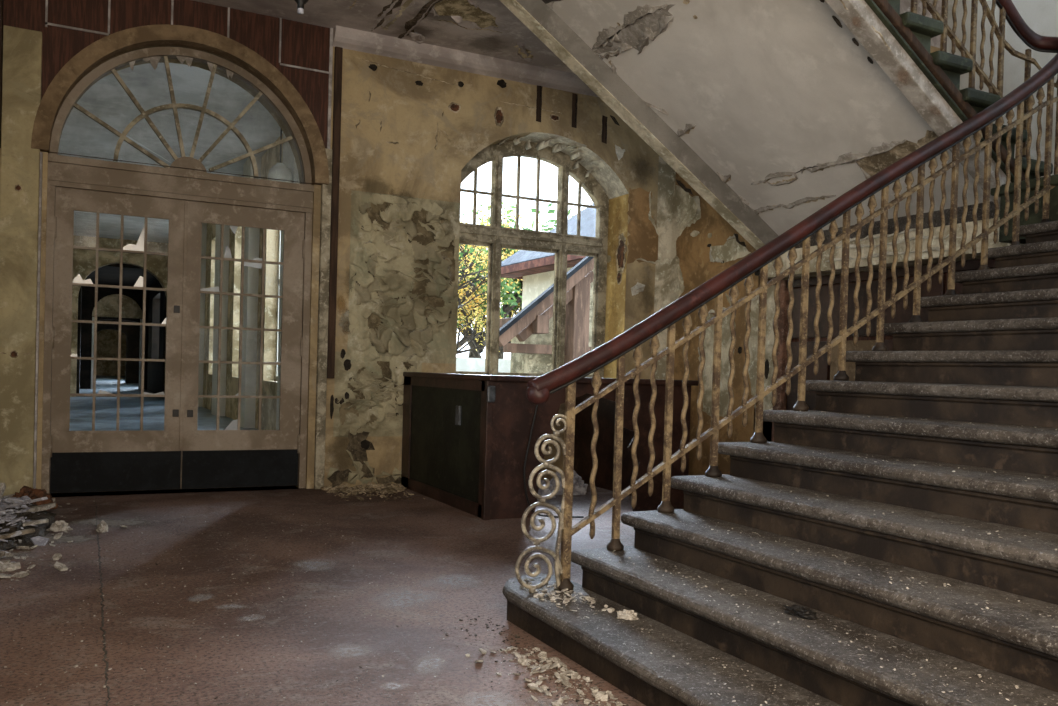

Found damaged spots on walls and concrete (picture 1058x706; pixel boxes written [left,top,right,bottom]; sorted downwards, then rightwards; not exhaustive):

flaking render [592,0,697,60]
peeling [616,180,751,304]
flaking render [340,349,351,371]
flaking render [330,392,349,419]
crack [95,503,111,706]